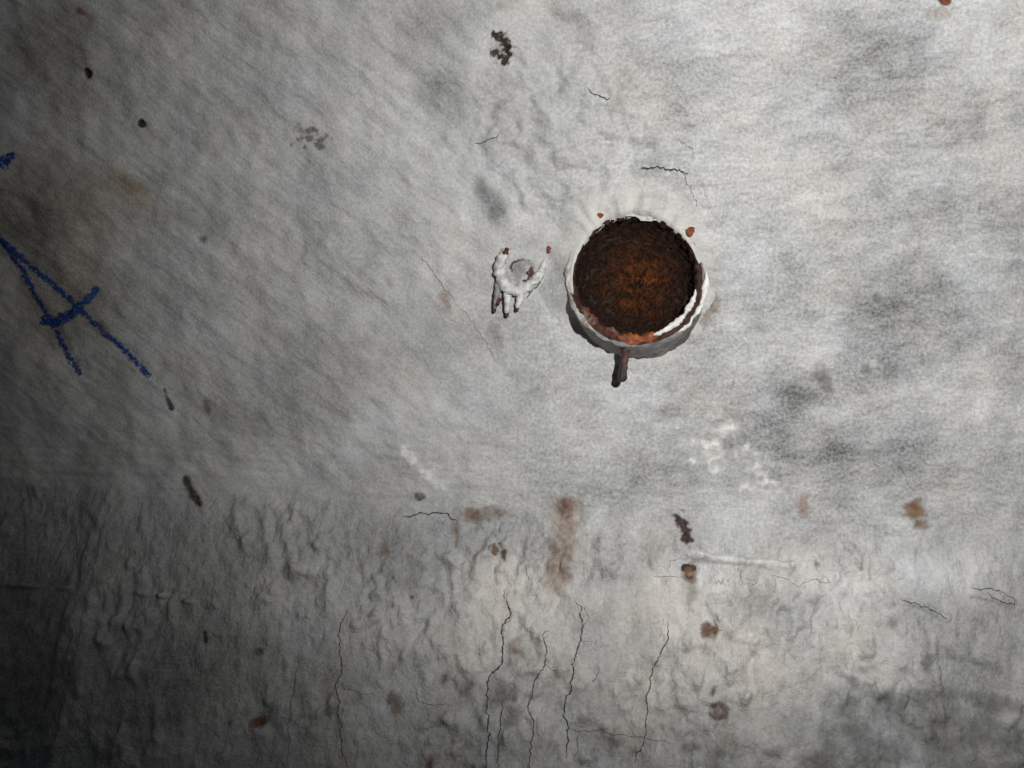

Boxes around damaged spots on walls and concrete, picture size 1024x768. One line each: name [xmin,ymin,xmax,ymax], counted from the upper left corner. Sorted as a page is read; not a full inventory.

crack [639,138,700,212]
corrosion [579,304,658,346]
crack [402,511,458,522]
corrosion [675,514,694,543]
corrosion [904,500,925,527]
crack [971,587,1015,606]
crack [335,609,379,768]
crack [484,590,670,768]